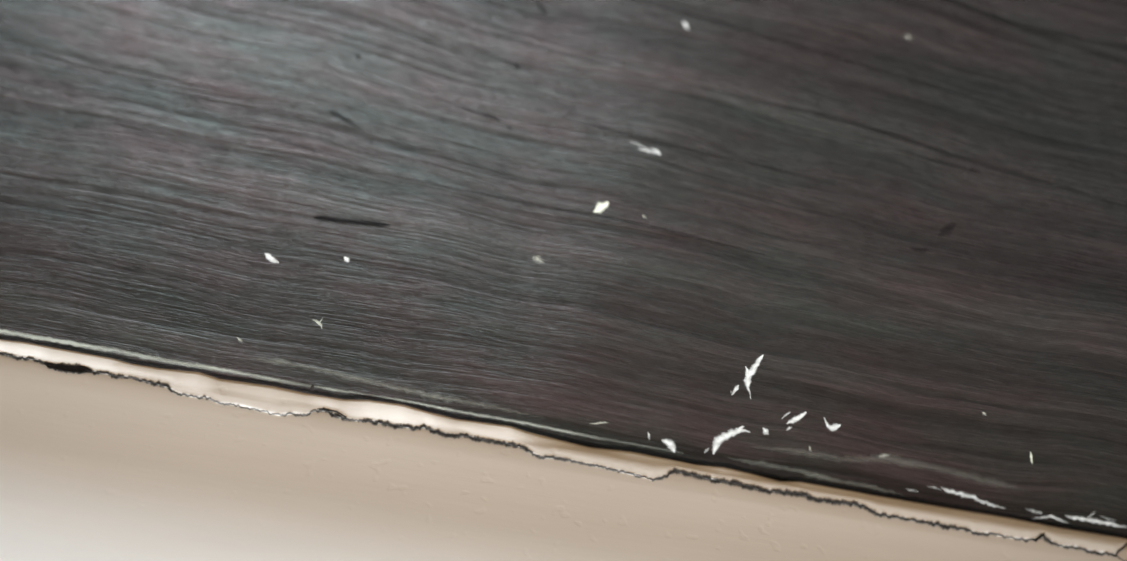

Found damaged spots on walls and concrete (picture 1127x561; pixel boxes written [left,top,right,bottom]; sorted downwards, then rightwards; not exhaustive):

crack [0,352,1127,561]